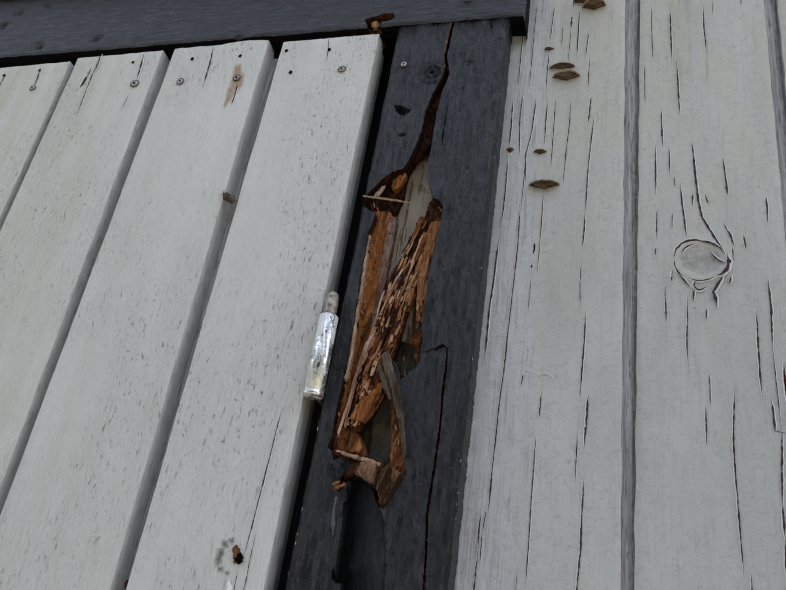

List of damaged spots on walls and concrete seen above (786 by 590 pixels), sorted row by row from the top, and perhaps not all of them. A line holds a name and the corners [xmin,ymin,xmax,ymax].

spalling [331,94,443,536]
crack [423,344,450,590]
crack [643,0,746,366]
crack [704,373,712,446]
crack [731,392,753,590]
crack [763,196,771,224]
crack [755,278,786,583]